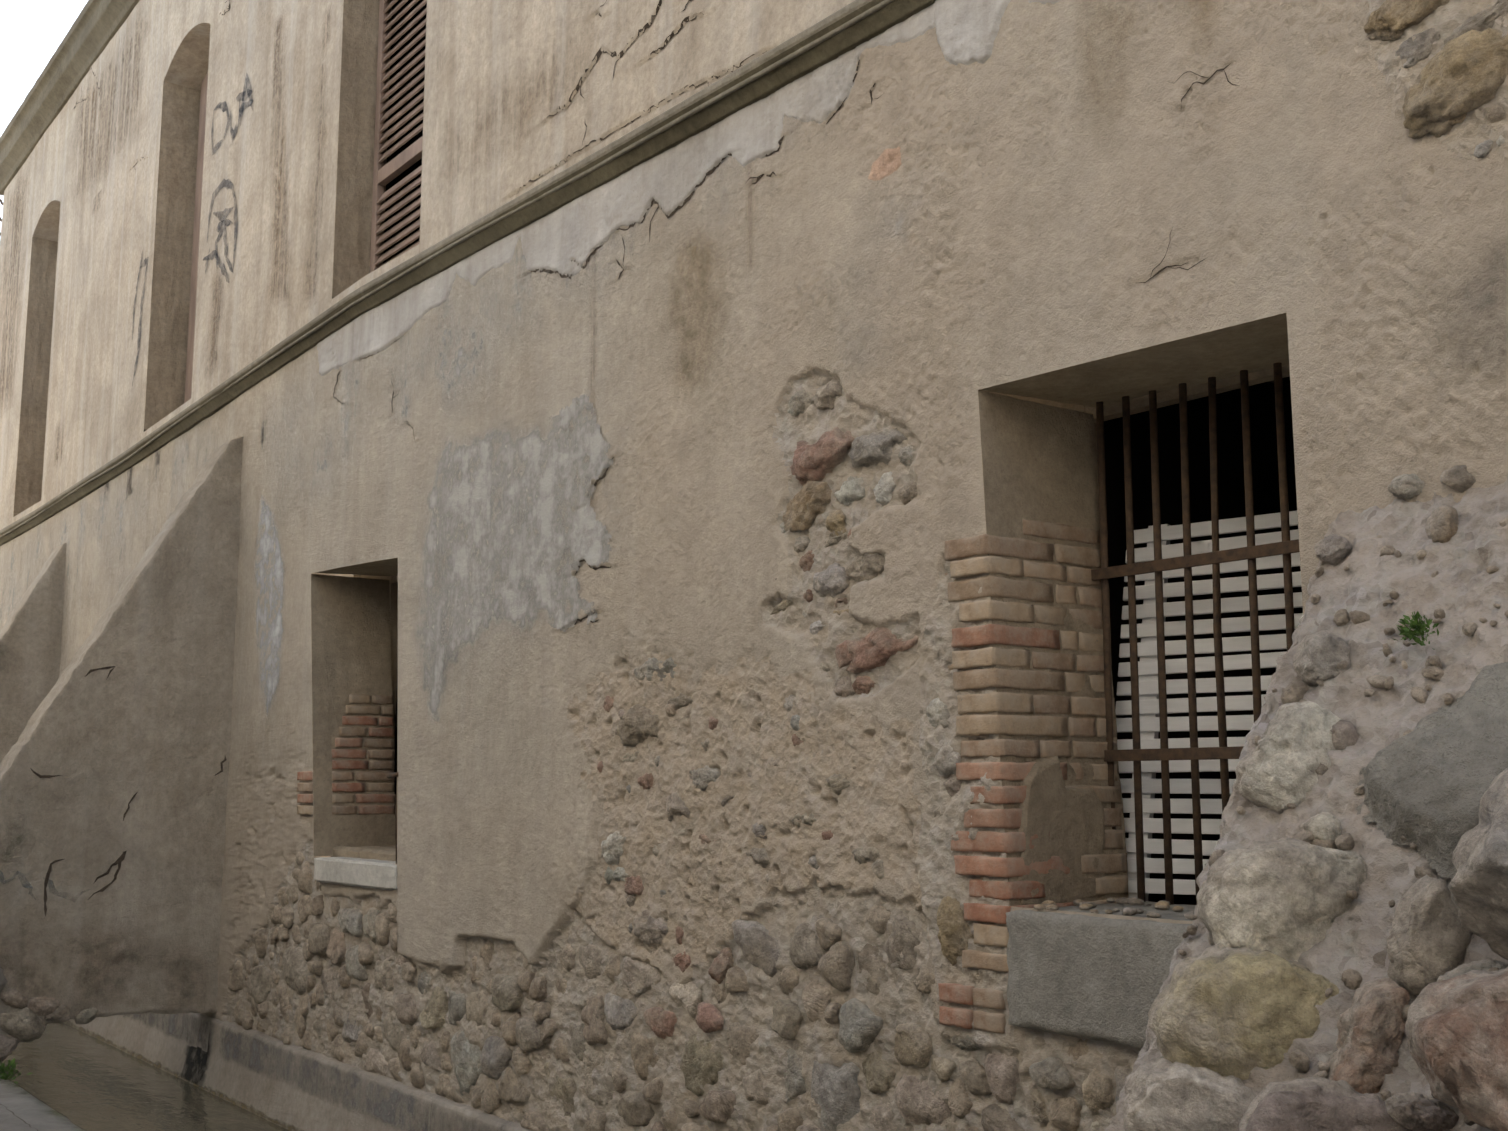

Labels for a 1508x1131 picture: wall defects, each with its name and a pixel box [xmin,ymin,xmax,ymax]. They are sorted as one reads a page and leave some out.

crack [519,0,770,191]
peeling [317,0,1061,376]
crack [85,666,115,680]
crack [30,768,62,778]
spalling [222,369,1142,1131]
crack [44,859,64,916]
crack [88,793,137,900]